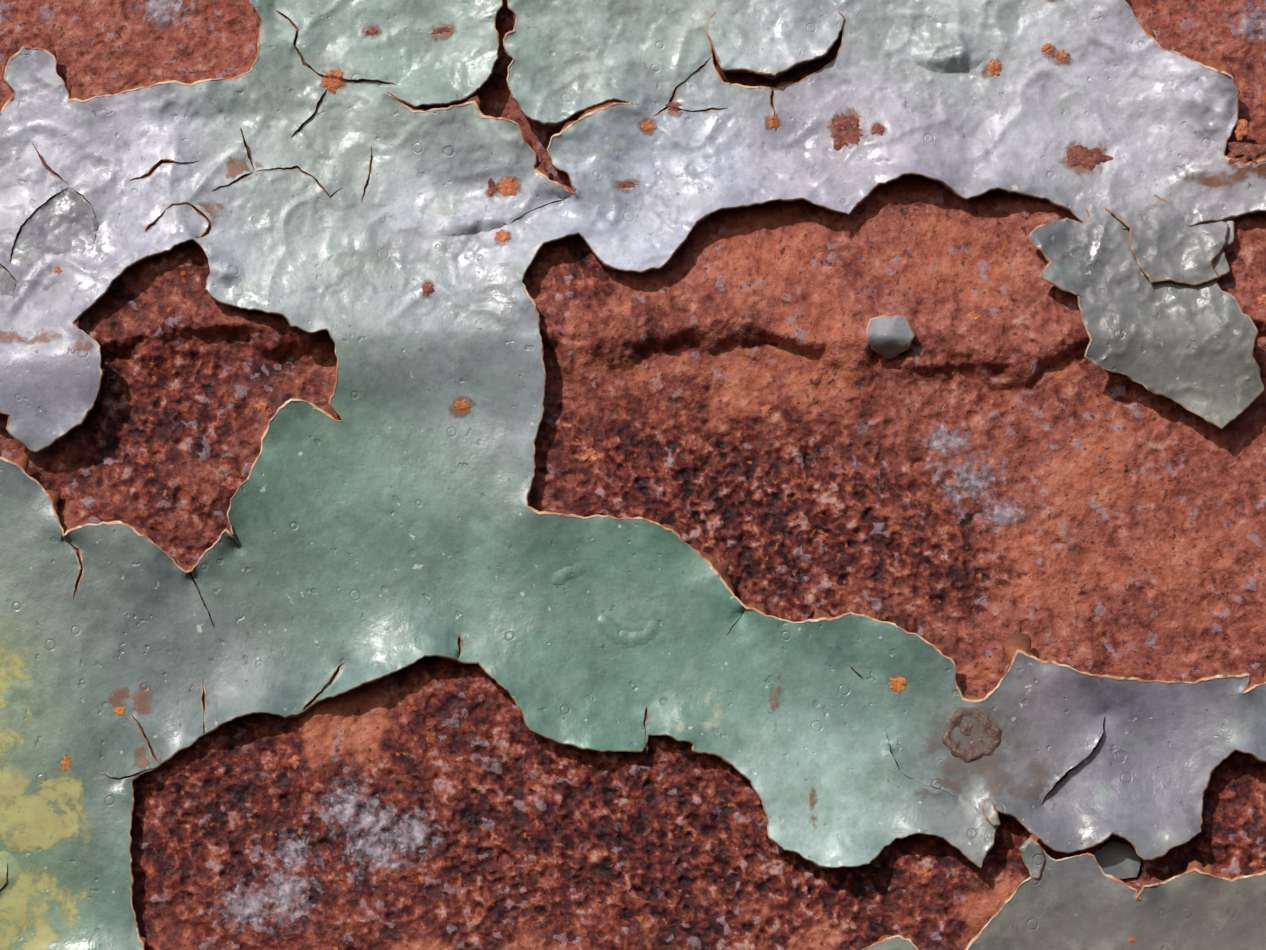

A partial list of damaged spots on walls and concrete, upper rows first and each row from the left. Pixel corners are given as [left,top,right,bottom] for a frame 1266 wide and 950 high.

crack [145,12,395,239]
crack [132,159,199,180]
rust [227,158,260,178]
rust [129,172,1266,950]
rust [109,686,151,716]
spalling [942,707,1003,763]
rust [61,756,71,772]